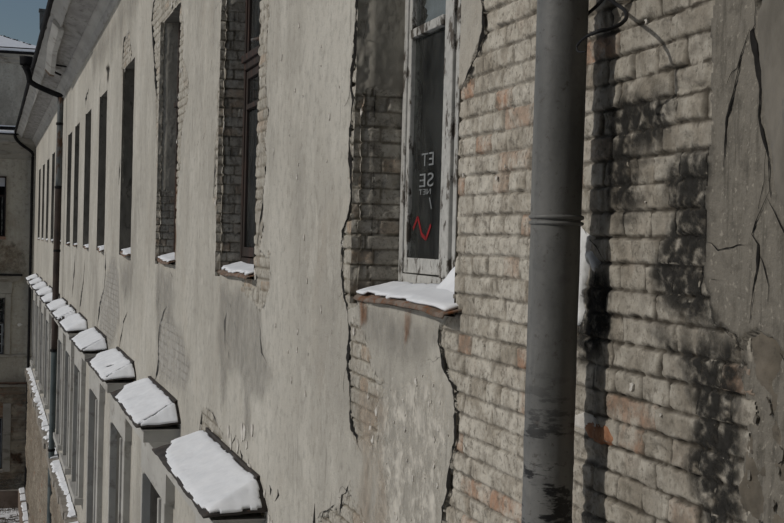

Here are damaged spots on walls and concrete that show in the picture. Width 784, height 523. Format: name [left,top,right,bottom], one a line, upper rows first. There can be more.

spalling [152,0,189,223]
spalling [212,0,227,256]
spalling [241,0,274,312]
spalling [338,54,375,309]
spalling [349,0,537,523]
spalling [572,0,784,523]
crack [709,3,784,319]